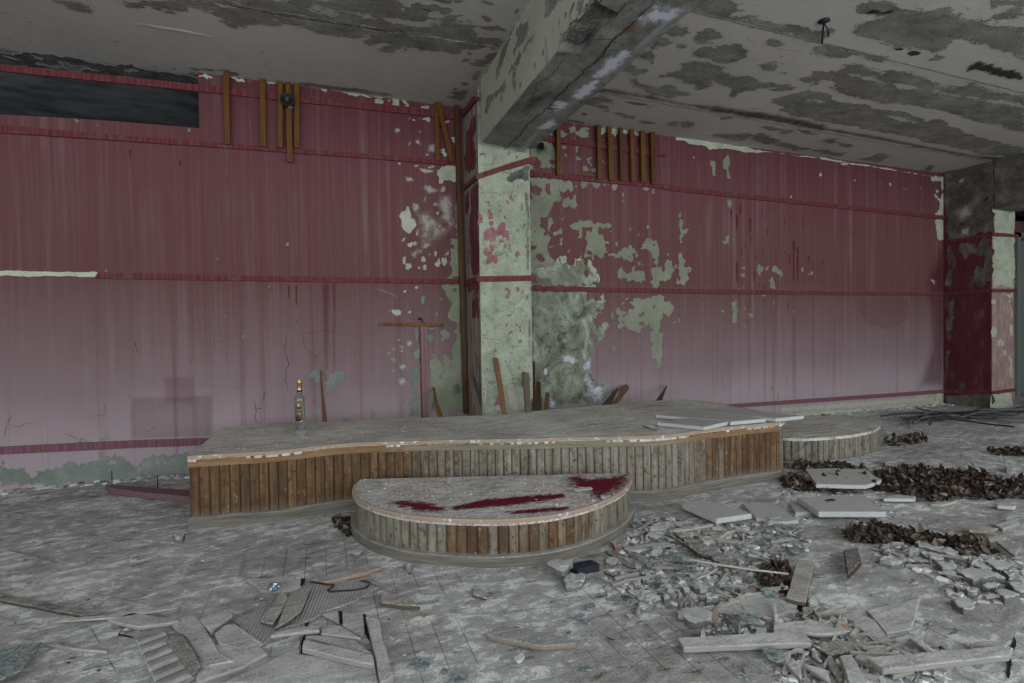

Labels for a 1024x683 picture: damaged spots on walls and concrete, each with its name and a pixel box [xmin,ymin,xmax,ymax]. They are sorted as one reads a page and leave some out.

peeling [52,0,92,13]
peeling [0,51,276,85]
peeling [123,0,545,185]
peeling [476,0,1024,416]
peeling [388,196,484,417]